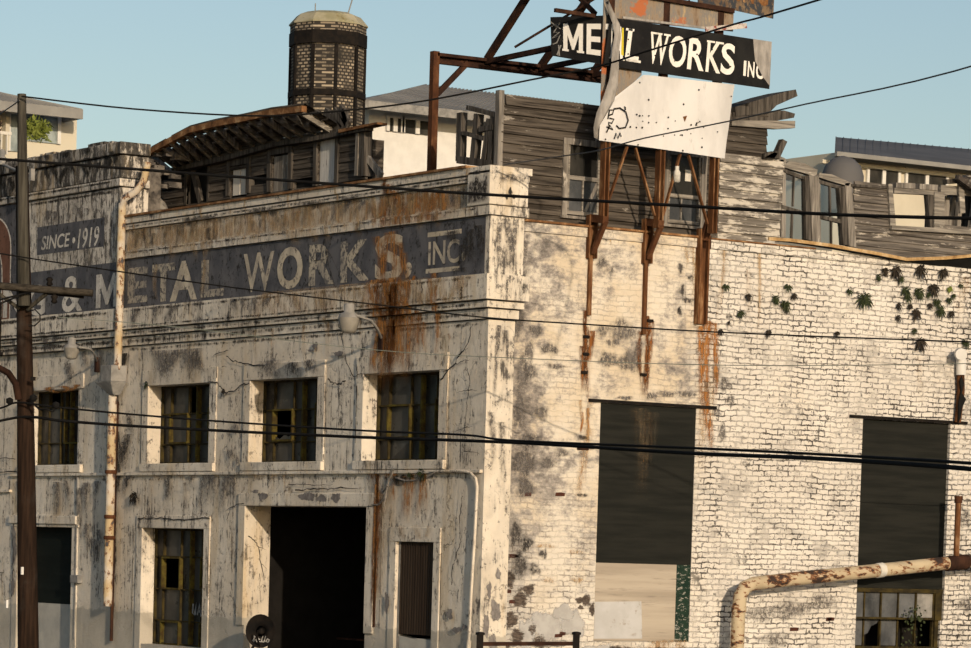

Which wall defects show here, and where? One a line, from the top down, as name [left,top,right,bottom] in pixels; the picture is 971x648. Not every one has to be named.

rust [124,180,467,372]
rust [580,310,595,390]
rust [638,316,654,390]
rust [698,321,718,439]
peeling [298,492,340,503]
peeling [483,554,566,648]
peeling [575,594,595,616]